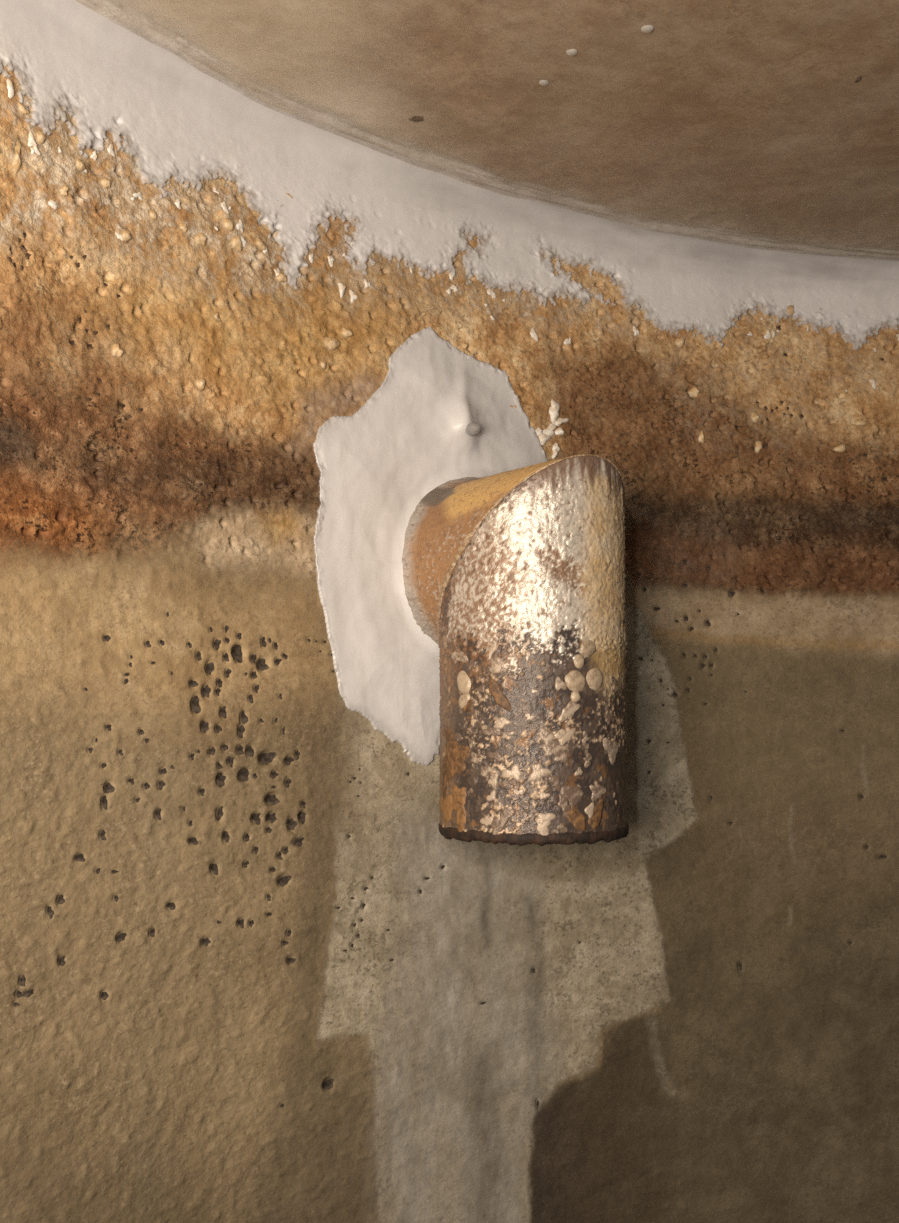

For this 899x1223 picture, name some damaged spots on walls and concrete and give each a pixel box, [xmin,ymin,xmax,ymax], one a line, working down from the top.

water stain [0,82,639,333]
rust [0,61,899,593]
water stain [390,0,899,241]
water stain [79,455,320,509]
water stain [654,498,899,547]
water stain [319,590,899,1223]